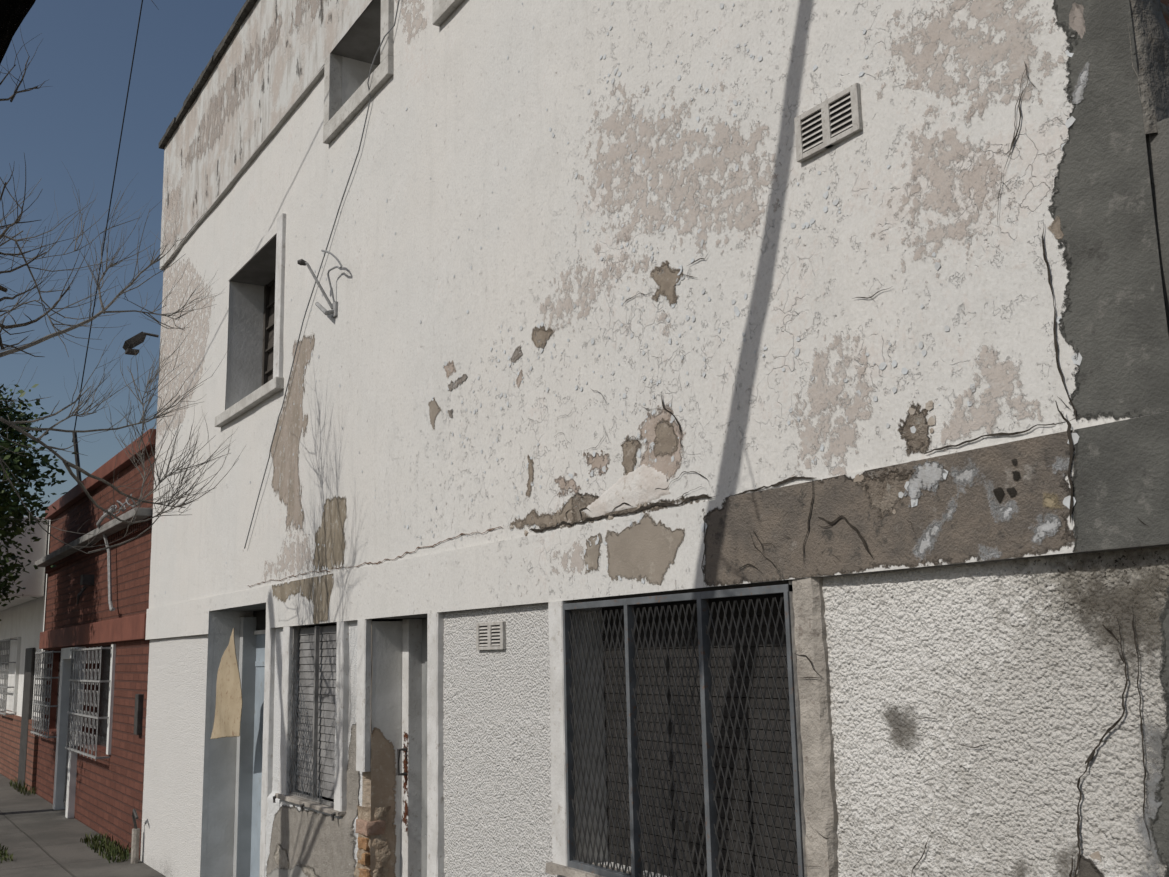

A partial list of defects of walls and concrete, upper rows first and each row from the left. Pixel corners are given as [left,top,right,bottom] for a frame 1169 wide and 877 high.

peeling [271,335,320,530]
peeling [272,496,347,624]
crack [248,526,502,587]
spalling [428,322,577,485]
crack [530,391,873,582]
peeling [509,0,1169,587]
crack [924,222,1081,523]
spalling [266,723,397,877]
spalling [1076,851,1103,877]
crack [1069,608,1151,877]
peeling [1148,586,1169,877]